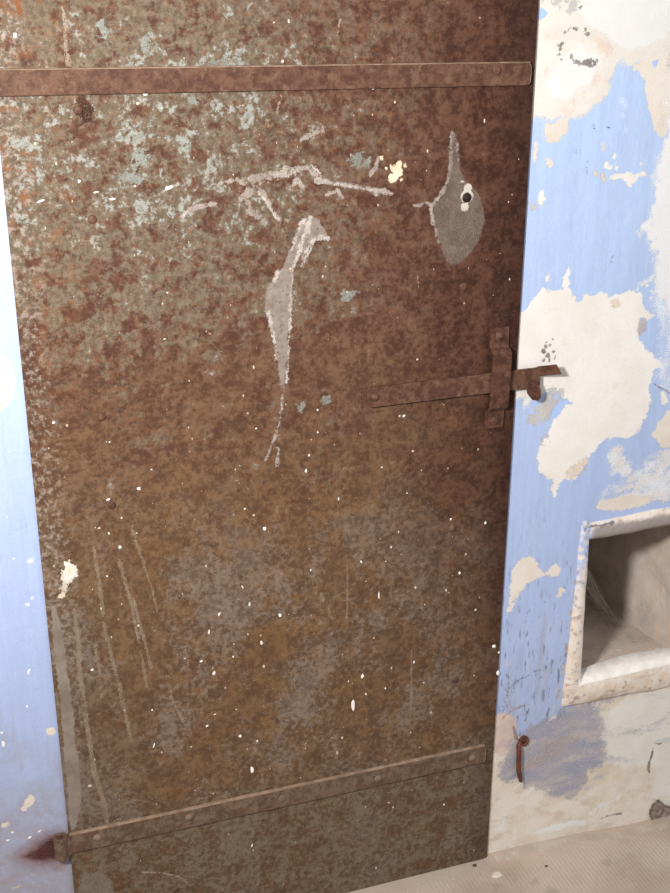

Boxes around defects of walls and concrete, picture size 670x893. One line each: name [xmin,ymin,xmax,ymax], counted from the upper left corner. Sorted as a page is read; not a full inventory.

damp [542,0,582,15]
peeling [532,22,622,168]
peeling [633,50,670,138]
peeling [593,142,647,187]
peeling [528,190,547,213]
peeling [515,388,528,401]
peeling [517,268,670,497]
peeling [506,556,561,613]
flaking render [487,635,670,854]
corrosion [9,822,71,874]